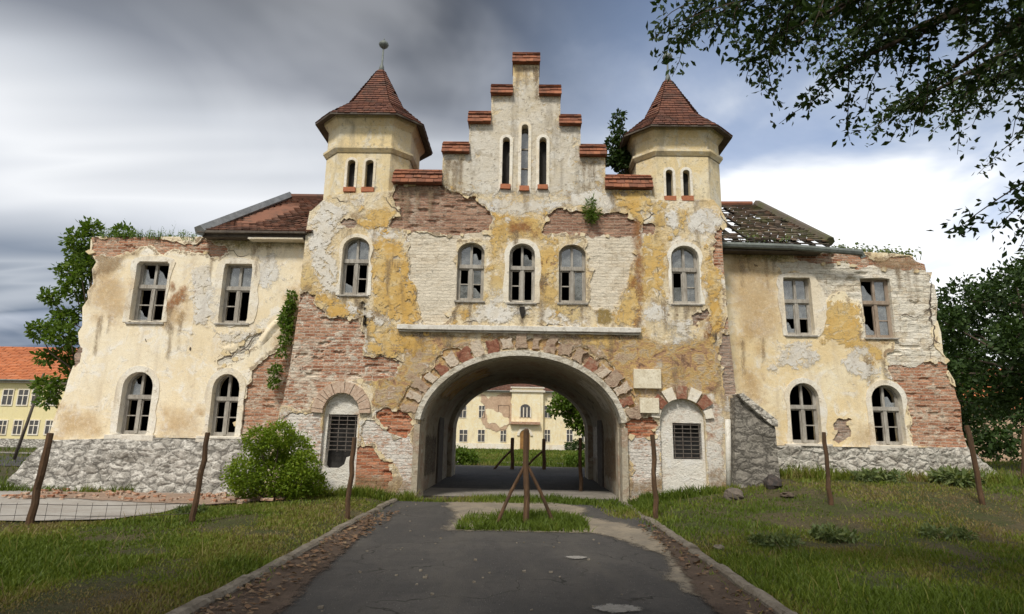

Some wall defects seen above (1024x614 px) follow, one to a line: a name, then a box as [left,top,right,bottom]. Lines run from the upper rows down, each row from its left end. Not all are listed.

peeling [85,79,736,499]
flaking render [767,252,967,447]
crack [899,275,939,357]